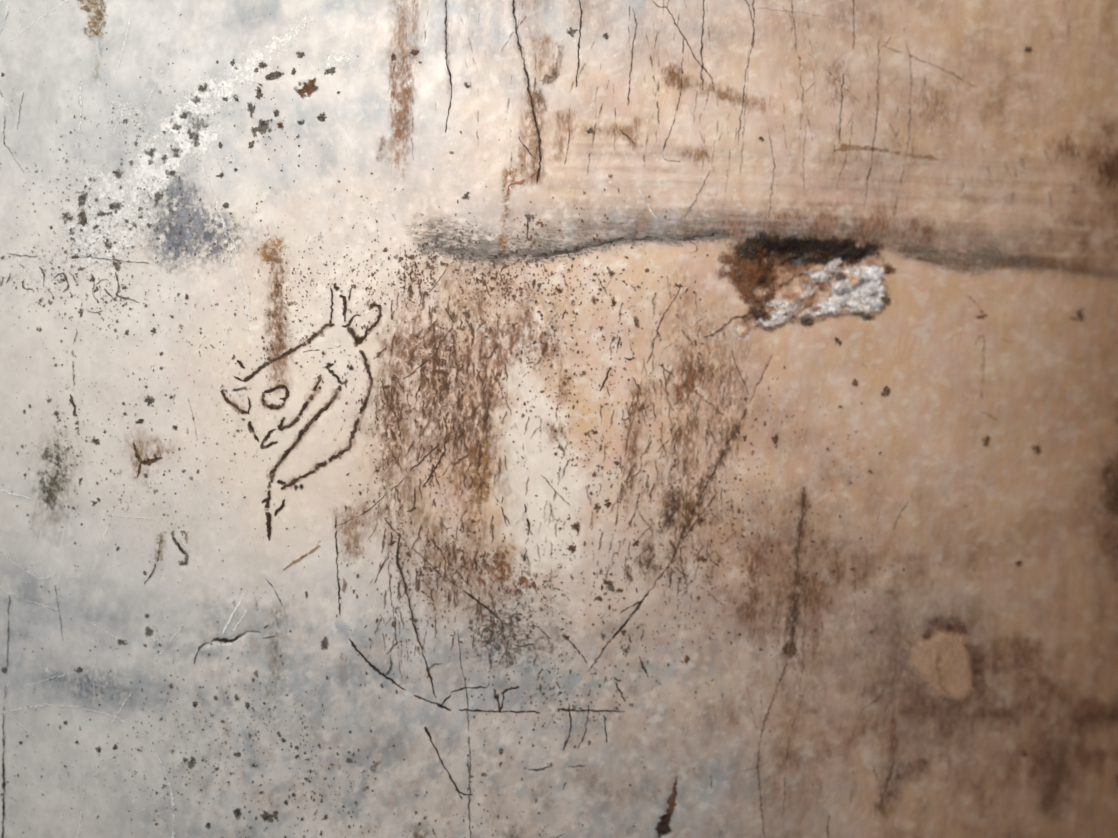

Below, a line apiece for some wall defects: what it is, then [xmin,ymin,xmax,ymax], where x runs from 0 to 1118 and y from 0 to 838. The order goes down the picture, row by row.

rust [380,0,419,162]
rust [261,239,288,386]
rust [396,336,448,416]
rust [481,306,548,366]
spalling [705,232,896,340]
rust [436,436,492,499]
rust [443,549,533,599]
crack [2,595,11,838]